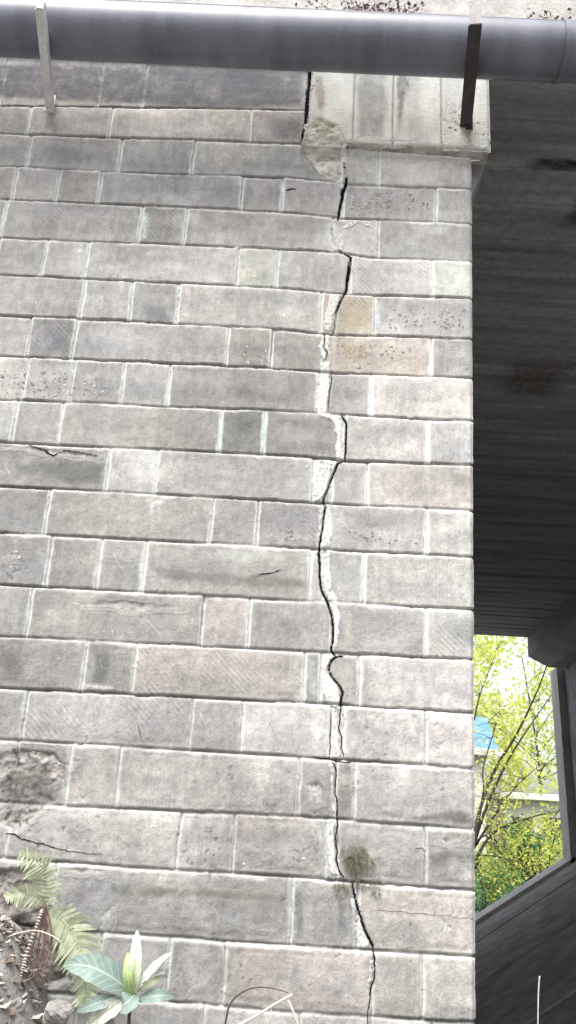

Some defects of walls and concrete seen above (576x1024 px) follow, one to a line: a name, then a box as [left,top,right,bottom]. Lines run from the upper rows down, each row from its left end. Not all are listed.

crack [301,72,313,145]
spalling [301,114,485,185]
crack [31,446,94,456]
crack [288,158,471,1024]
crack [6,833,101,855]